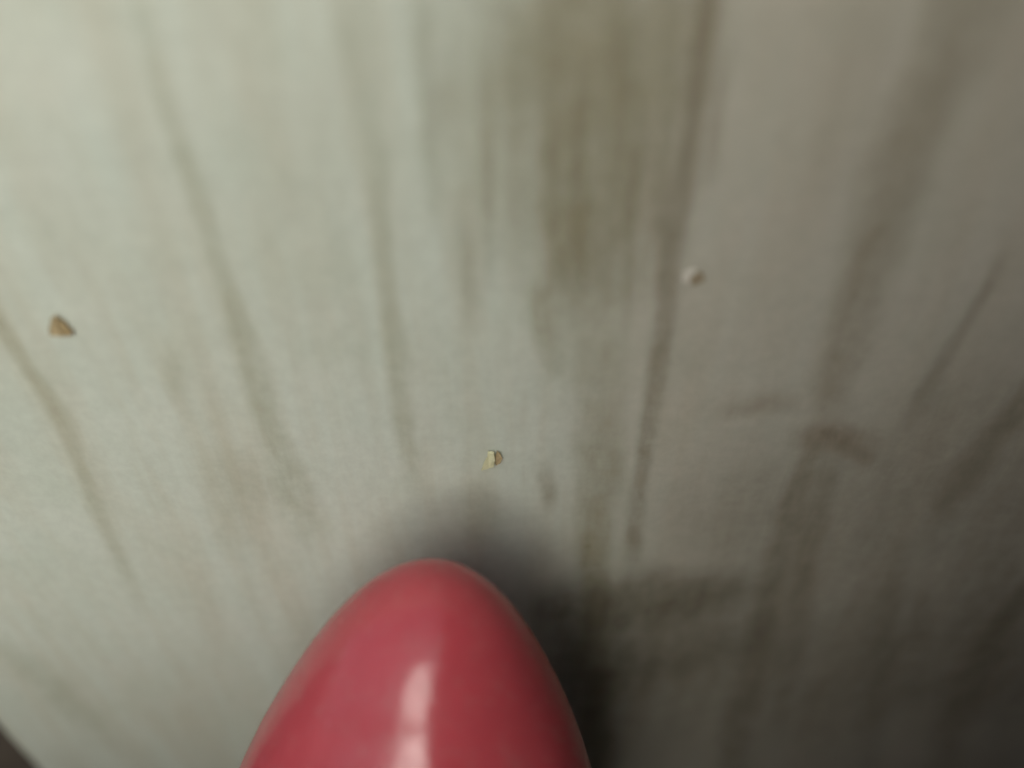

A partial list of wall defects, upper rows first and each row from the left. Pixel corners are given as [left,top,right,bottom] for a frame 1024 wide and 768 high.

peeling [49,314,72,337]
peeling [481,451,502,470]